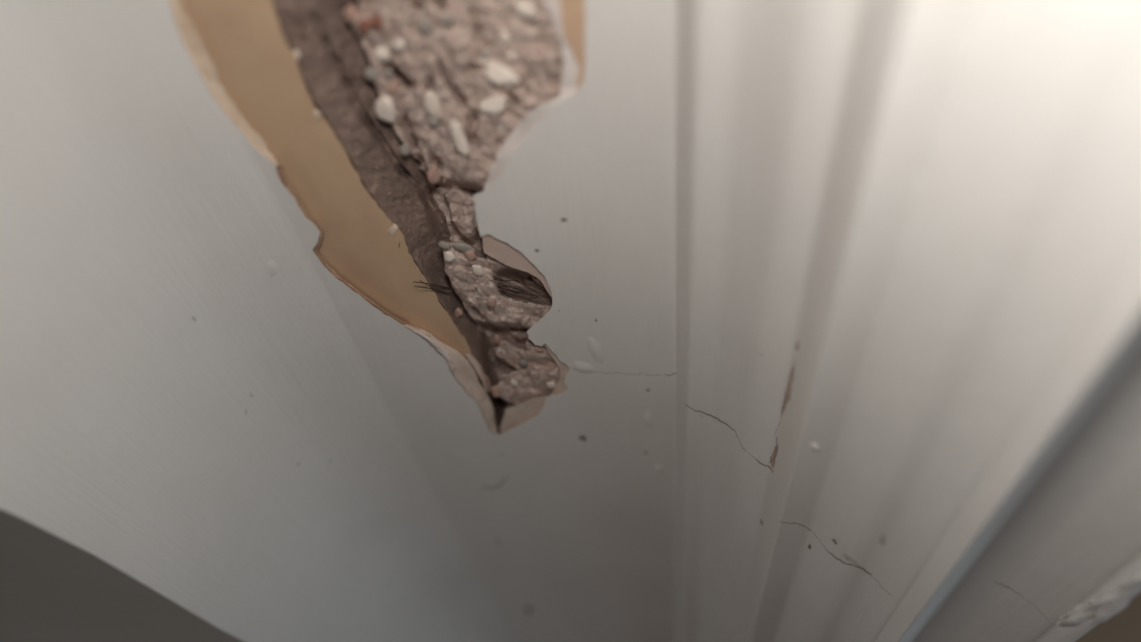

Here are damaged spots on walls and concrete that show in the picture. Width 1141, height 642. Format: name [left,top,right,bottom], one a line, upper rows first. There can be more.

flaking render [168,0,586,435]
crack [688,407,745,450]
crack [786,522,889,594]